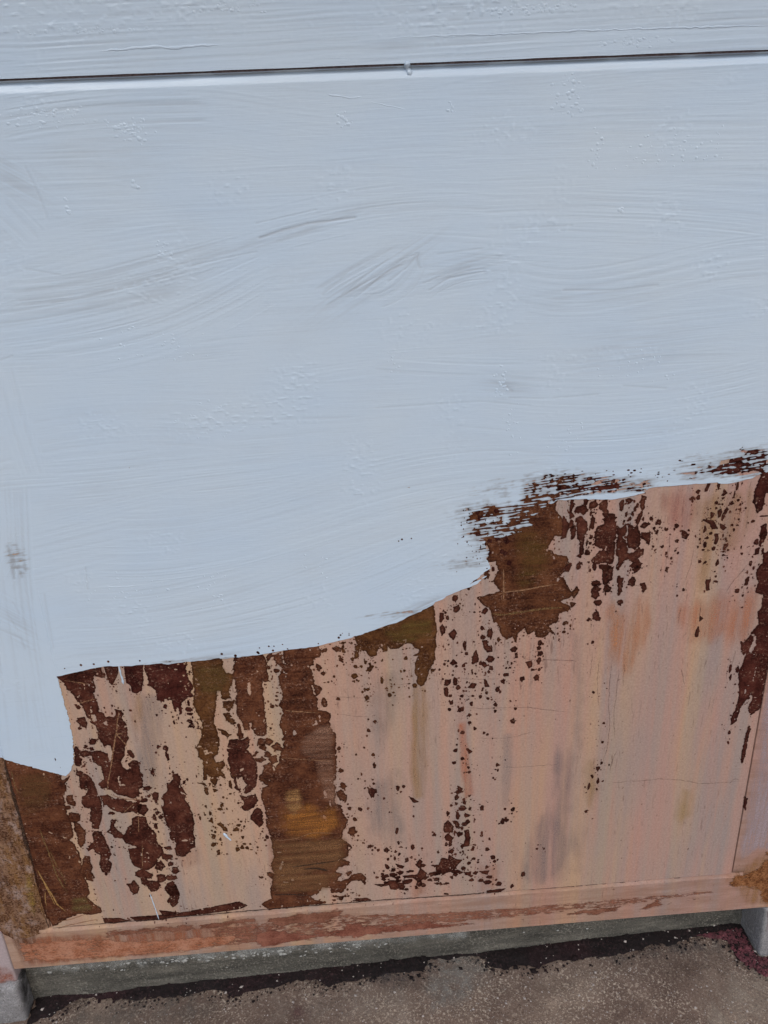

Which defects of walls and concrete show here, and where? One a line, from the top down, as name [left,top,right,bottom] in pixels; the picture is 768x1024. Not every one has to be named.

corrosion [0,447,768,963]